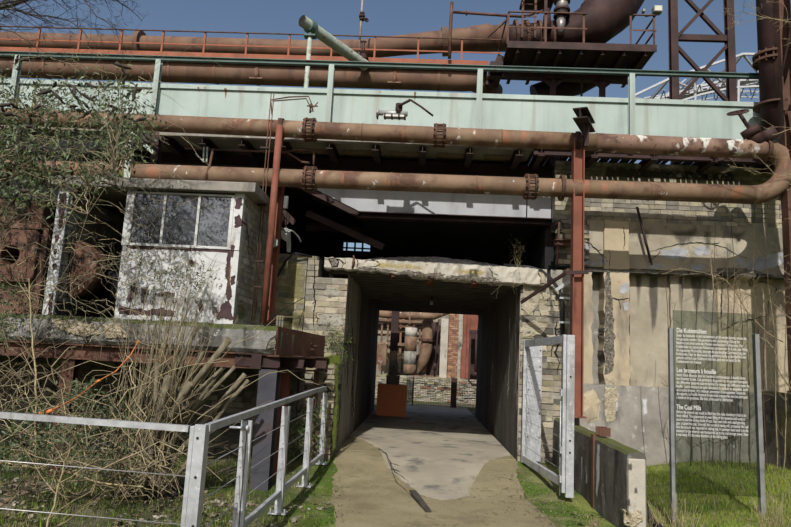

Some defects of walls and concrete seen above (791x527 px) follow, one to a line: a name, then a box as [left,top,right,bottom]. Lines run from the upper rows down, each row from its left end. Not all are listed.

peeling [52,193,67,270]
peeling [234,198,248,228]
spalling [550,219,571,270]
crack [647,242,746,263]
peeling [118,245,236,320]
water stain [692,278,715,306]
spalling [584,220,630,423]